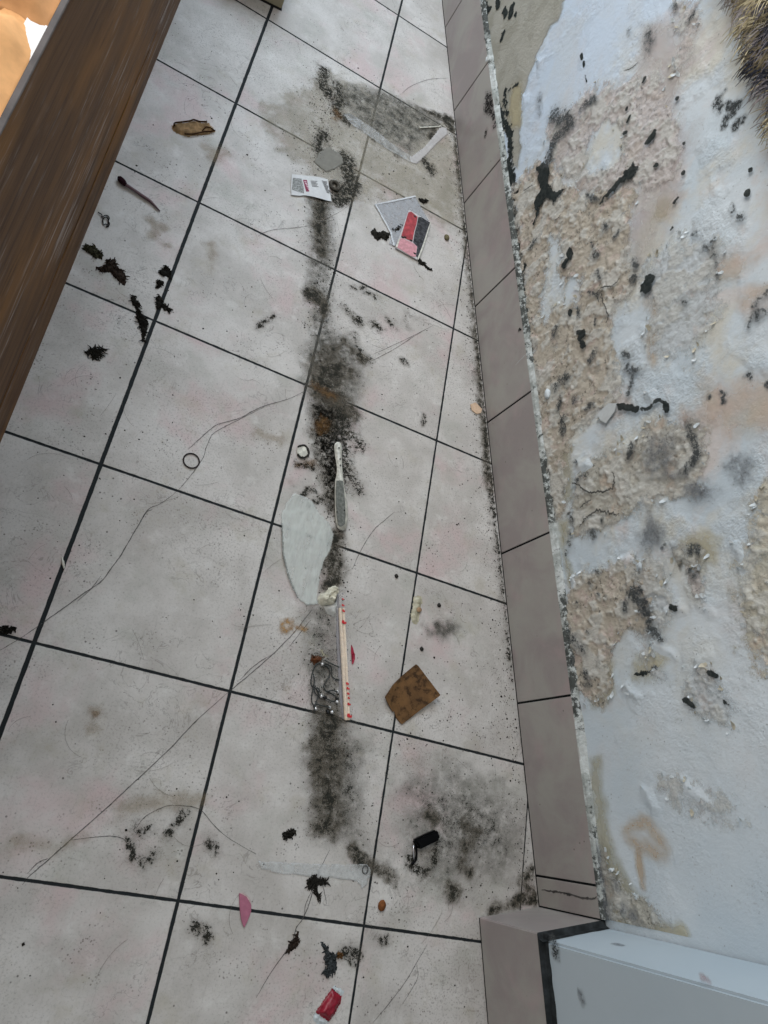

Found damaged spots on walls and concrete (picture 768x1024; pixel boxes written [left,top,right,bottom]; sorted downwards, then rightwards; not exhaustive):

leakage [483,0,599,311]
leakage [585,161,639,205]
leakage [713,89,746,132]
leakage [293,129,413,515]
leakage [314,64,513,682]
peeling [511,0,727,537]
leakage [616,350,670,413]
peeling [566,543,710,709]
peeling [680,662,736,735]
peeling [728,477,768,679]
leakage [347,770,516,902]
crack [543,889,597,900]